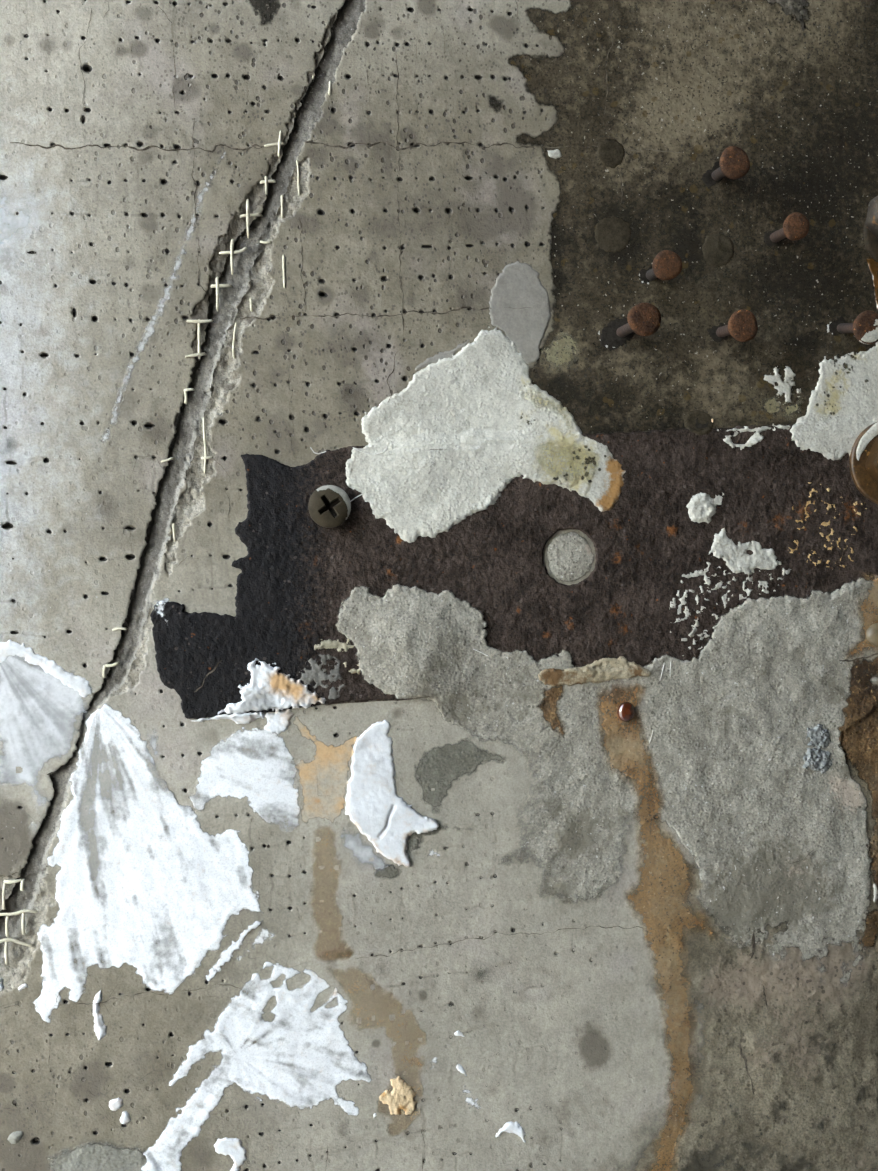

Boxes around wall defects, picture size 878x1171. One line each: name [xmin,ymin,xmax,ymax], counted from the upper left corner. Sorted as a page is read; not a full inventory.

crack [10,0,264,306]
leakage [508,0,878,483]
crack [194,661,221,692]
crack [328,696,430,705]
peeling [345,720,439,867]
rust [837,575,878,888]
spalling [0,871,56,994]
crack [5,984,238,1010]
rust [597,684,716,1171]
rust [858,902,878,949]